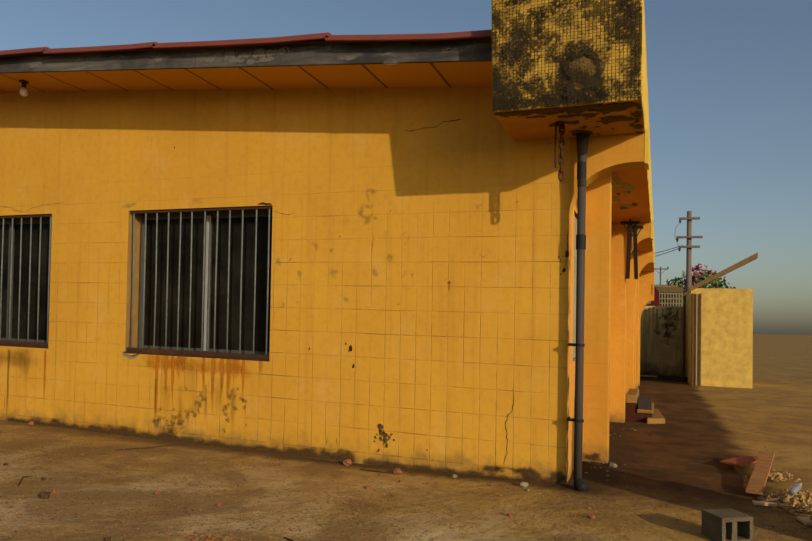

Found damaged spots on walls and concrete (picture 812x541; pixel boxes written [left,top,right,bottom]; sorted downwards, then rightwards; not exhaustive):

damp [429,0,643,134]
peeling [494,103,642,136]
peeling [612,177,638,210]
damp [7,418,354,463]
damp [364,410,574,484]
crack [504,388,514,461]